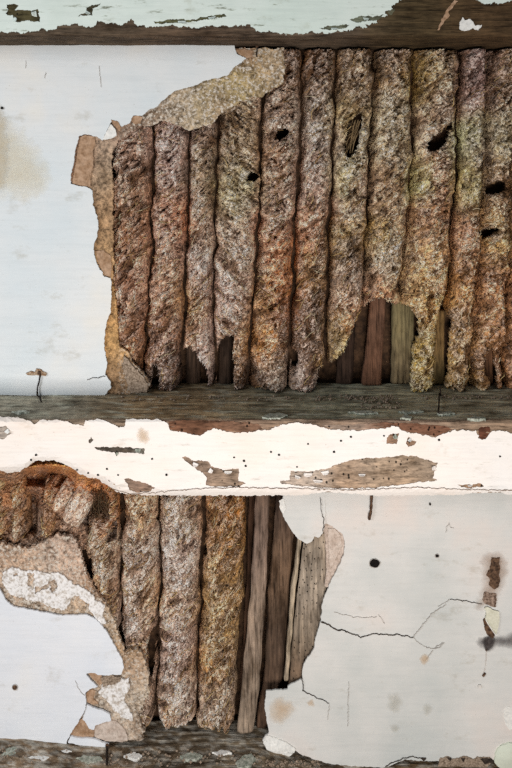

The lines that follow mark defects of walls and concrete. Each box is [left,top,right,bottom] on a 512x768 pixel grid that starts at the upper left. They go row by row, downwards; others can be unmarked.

peeling [6,4,40,22]
peeling [154,14,227,24]
peeling [321,9,395,30]
flaking render [71,47,285,394]
peeling [125,479,154,492]
peeling [182,457,245,487]
peeling [279,422,452,587]
flaking render [0,532,150,747]
crack [321,599,481,661]
flaking render [484,606,500,636]
crack [301,676,349,727]